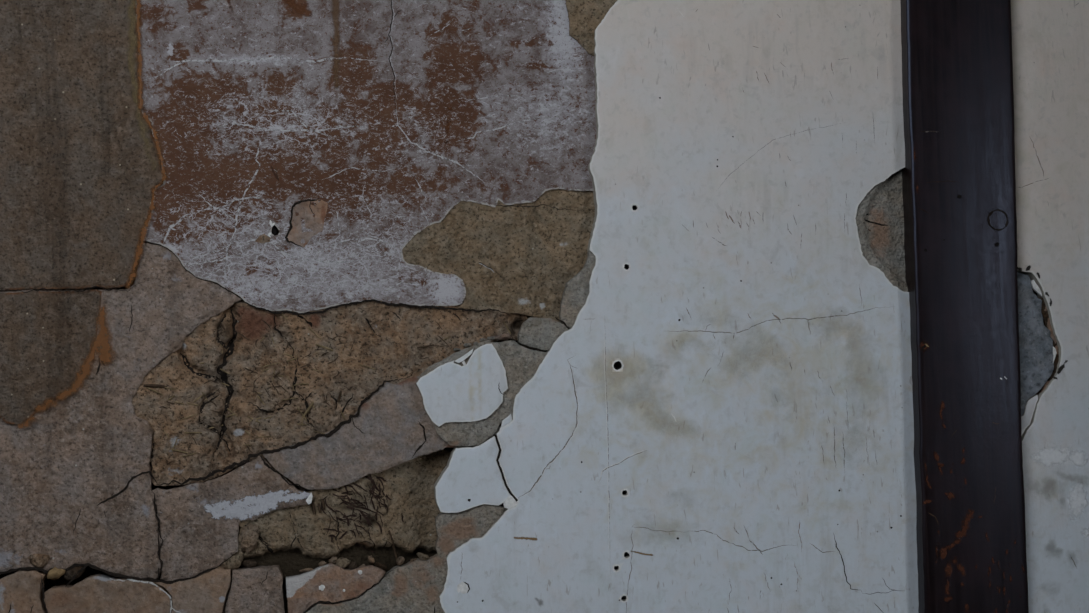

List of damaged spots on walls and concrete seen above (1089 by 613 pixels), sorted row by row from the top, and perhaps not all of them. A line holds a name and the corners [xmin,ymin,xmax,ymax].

rust [286,0,312,17]
rust [332,0,340,88]
peeling [132,0,617,486]
crack [496,203,580,211]
spalling [855,169,908,292]
crack [0,0,552,613]
crack [495,357,579,502]
spalling [204,449,451,579]
crack [626,524,898,613]